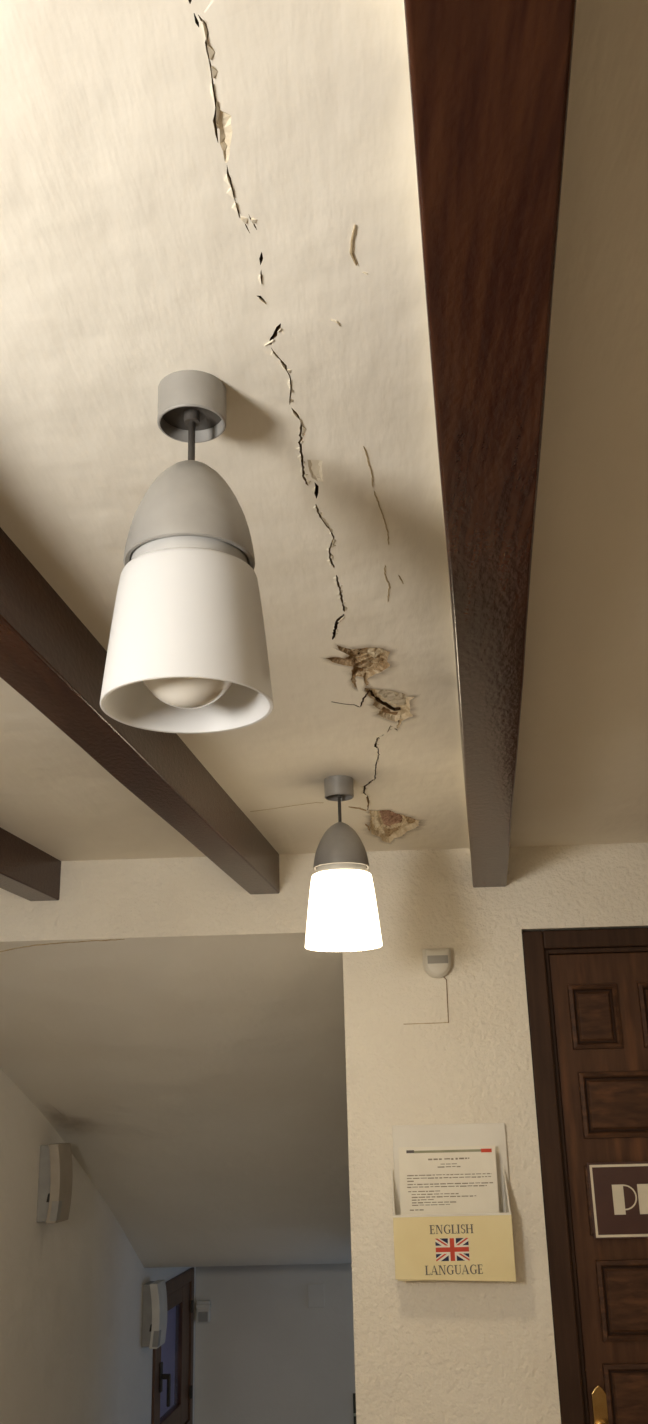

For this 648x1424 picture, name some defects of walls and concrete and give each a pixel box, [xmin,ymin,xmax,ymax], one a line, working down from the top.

crack [188,0,347,640]
crack [364,448,403,601]
spalling [325,645,414,730]
crack [361,725,397,810]
spalling [348,797,419,843]